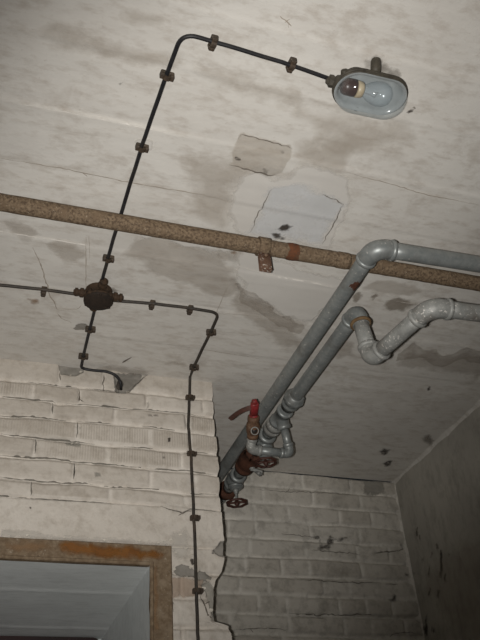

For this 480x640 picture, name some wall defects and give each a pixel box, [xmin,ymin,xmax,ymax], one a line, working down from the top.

crack [1,231,90,323]
spalling [114,373,146,393]
rust [61,542,160,558]
peeling [172,559,214,619]